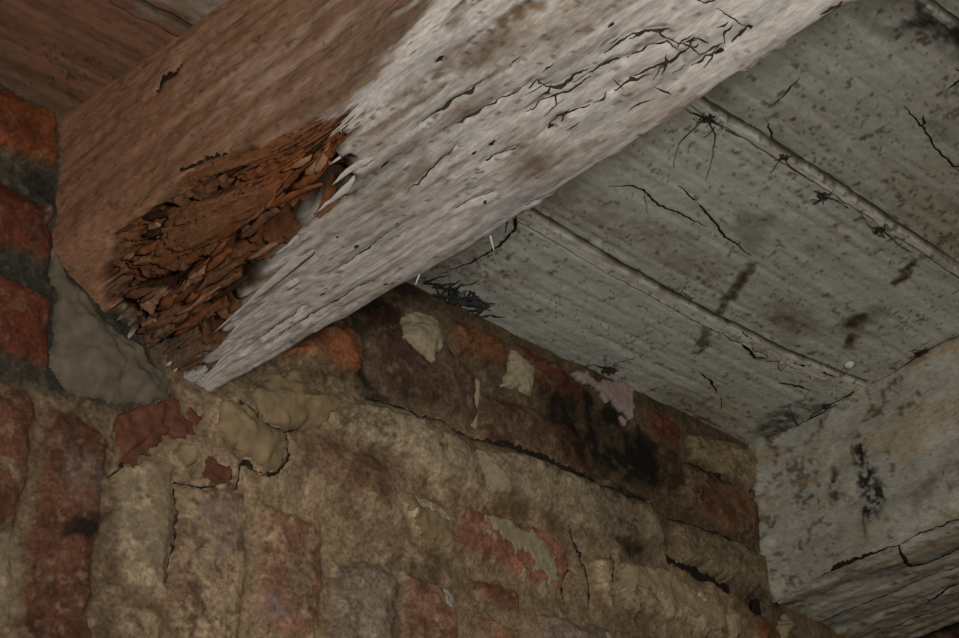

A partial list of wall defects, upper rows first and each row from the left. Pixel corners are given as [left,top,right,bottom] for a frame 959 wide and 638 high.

crack [407,0,751,193]
crack [325,215,416,274]
crack [438,198,540,275]
crack [247,281,369,349]
peeling [569,371,635,427]
crack [107,461,125,478]
crack [164,400,312,583]
peeling [476,448,513,494]
crack [366,398,629,497]
water stain [550,392,656,501]
peeling [484,514,560,598]